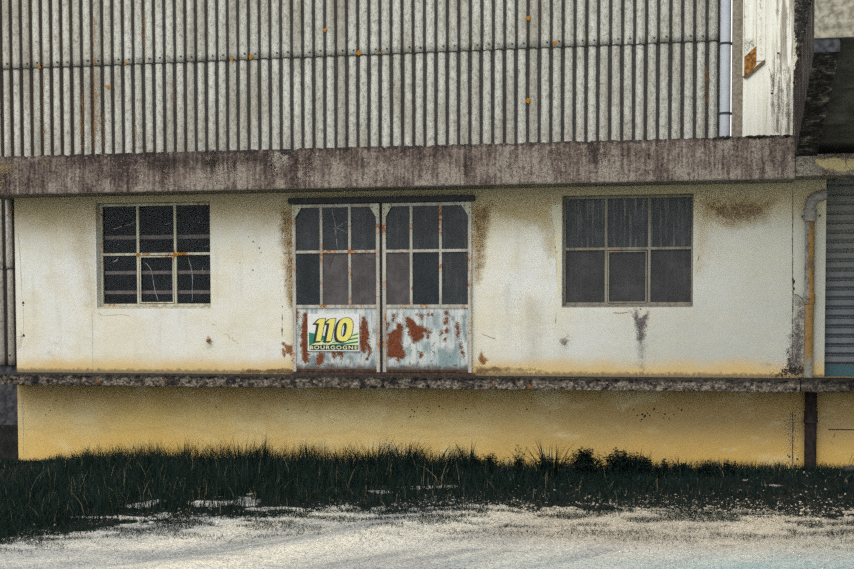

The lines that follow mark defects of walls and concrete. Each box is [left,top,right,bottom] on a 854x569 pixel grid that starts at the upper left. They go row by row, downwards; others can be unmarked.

damp [770,0,811,132]
corrosion [281,208,292,298]
corrosion [282,309,344,365]
corrosion [360,316,372,360]
corrosion [386,311,465,363]
damp [634,312,648,341]
damp [772,310,804,377]